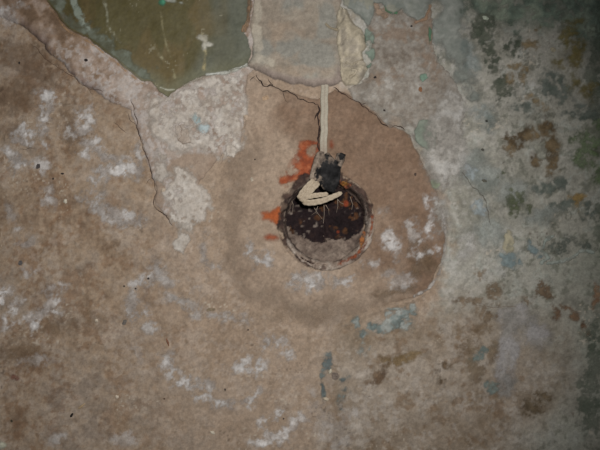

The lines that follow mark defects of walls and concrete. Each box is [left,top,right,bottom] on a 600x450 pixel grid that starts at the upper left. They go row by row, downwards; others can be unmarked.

peeling [47,0,252,97]
mould [461,0,600,128]
crack [251,75,320,151]
crack [334,87,404,129]
crack [115,102,172,225]
corrosion [263,207,280,224]
corrosion [279,141,319,184]
flaking render [226,0,480,338]
mould [507,188,532,218]
mould [533,178,567,194]
mould [577,319,600,434]